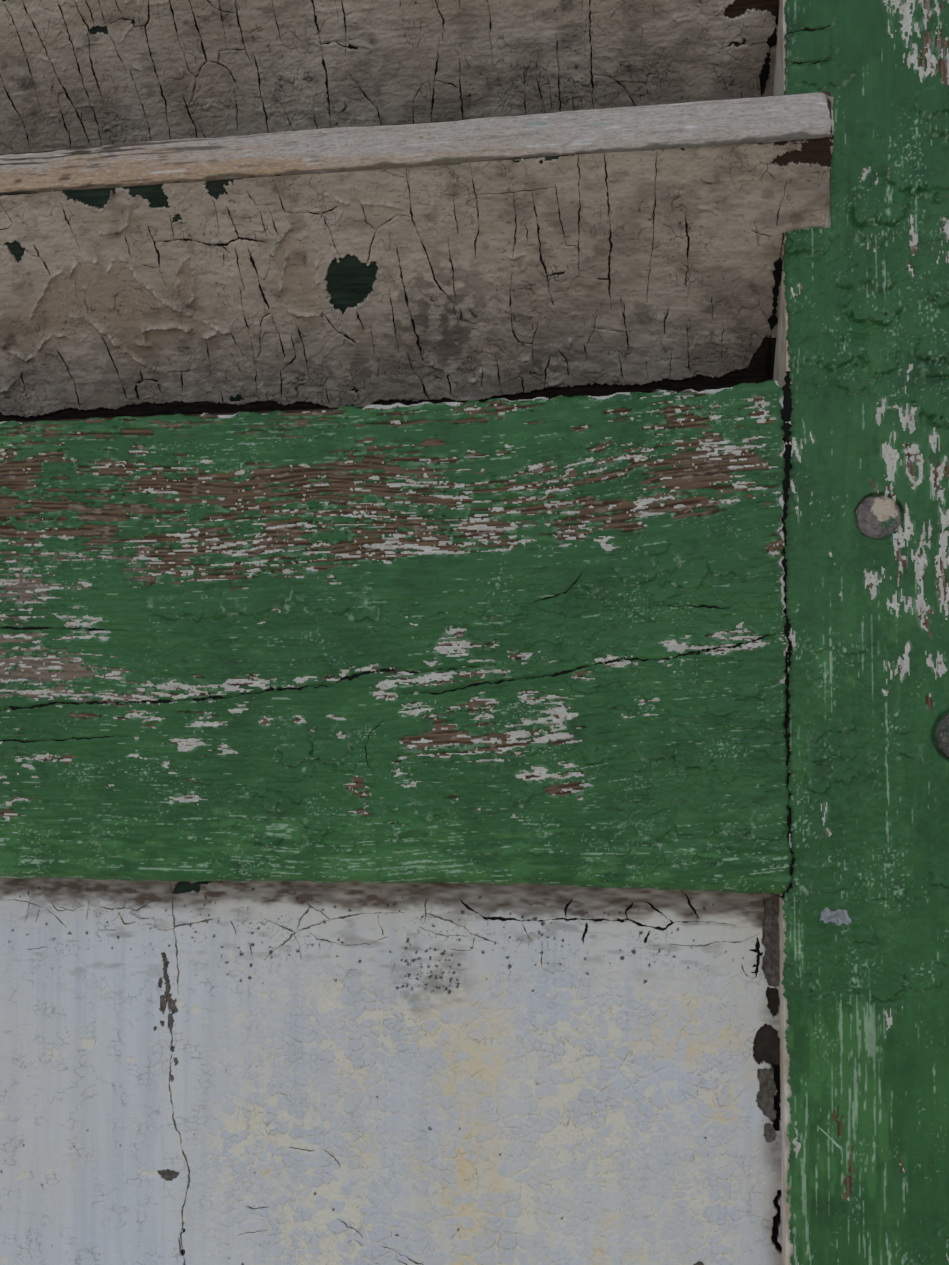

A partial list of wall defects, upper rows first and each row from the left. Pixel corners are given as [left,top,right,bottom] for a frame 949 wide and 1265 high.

crack [0,0,381,151]
crack [413,0,492,123]
peeling [883,0,949,86]
peeling [62,184,182,224]
peeling [759,136,834,167]
peeling [324,254,378,315]
crack [0,154,795,899]
peeling [0,337,814,805]
peeling [864,364,949,709]
crack [12,882,763,1265]
peeling [753,899,801,1158]
peeling [771,1190,782,1253]